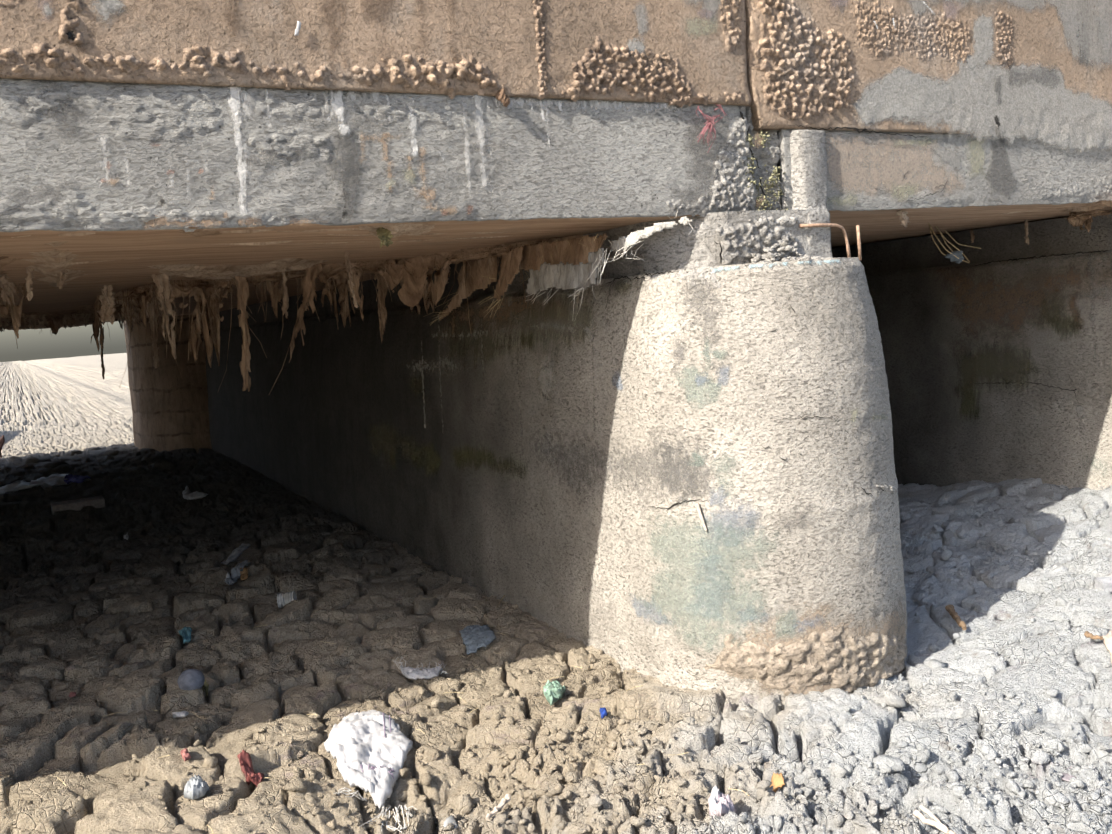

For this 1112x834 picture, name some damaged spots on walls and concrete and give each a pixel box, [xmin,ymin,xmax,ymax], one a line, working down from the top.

damp [228,86,249,214]
damp [326,90,390,217]
damp [408,100,418,156]
peeling [856,15,1112,151]
damp [988,135,1016,194]
crack [647,499,707,510]